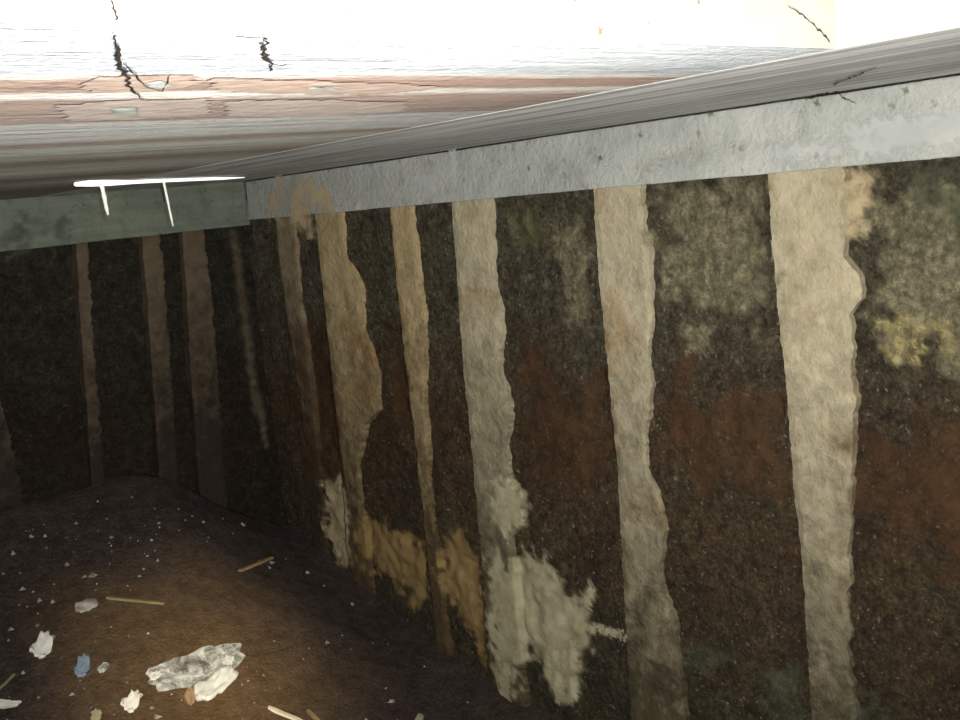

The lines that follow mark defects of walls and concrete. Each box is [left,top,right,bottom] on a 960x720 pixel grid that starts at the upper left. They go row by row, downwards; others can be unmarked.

crack [110,0,171,100]
damp [321,474,628,706]